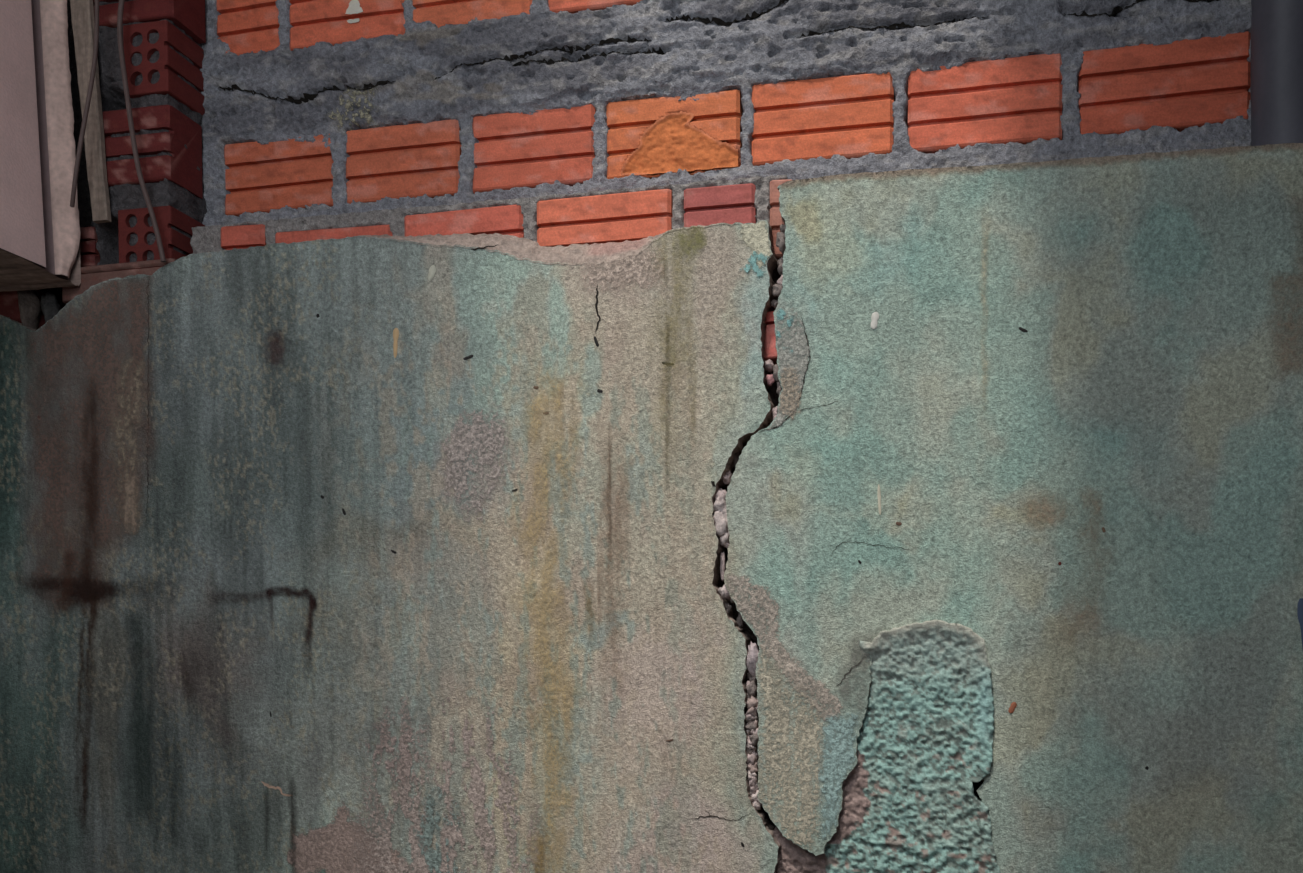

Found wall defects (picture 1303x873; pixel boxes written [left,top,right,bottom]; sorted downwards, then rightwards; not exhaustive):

crack [434,0,789,80]
crack [798,16,987,37]
crack [1064,0,1146,17]
crack [1184,0,1219,8]
spalling [621,111,738,176]
crack [593,284,601,332]
peeling [768,308,810,429]
crack [695,224,837,828]
flaking render [726,574,1001,873]
peeling [287,697,540,873]